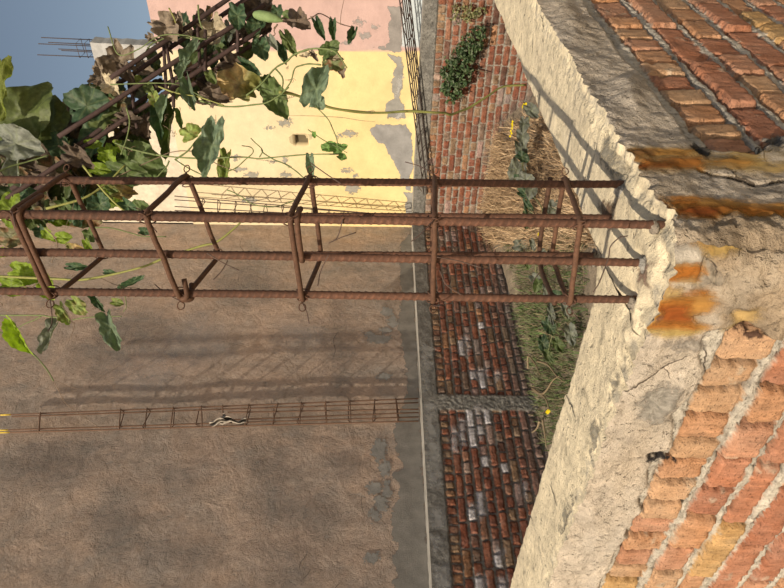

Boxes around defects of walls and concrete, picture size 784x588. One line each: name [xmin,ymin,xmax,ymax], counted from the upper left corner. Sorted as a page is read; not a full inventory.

peeling [352,6,414,213]
peeling [233,154,258,177]
peeling [340,167,361,195]
rust [626,148,784,173]
rust [663,196,784,219]
rust [646,262,717,336]
crack [625,348,707,392]
peeling [363,263,429,588]